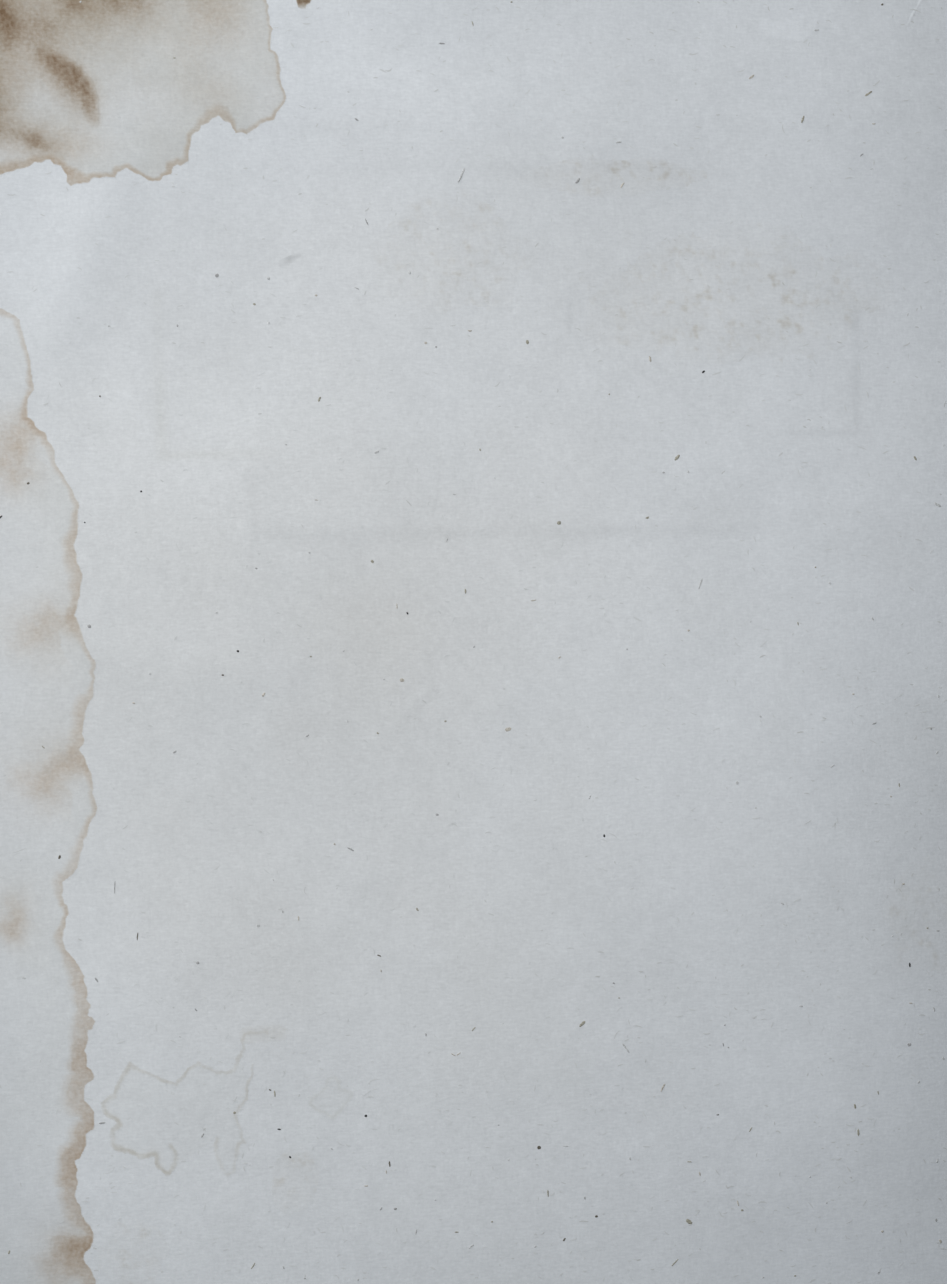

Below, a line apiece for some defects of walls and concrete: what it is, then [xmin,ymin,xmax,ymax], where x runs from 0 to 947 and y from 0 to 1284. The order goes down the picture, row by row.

damp [0,0,287,186]
damp [296,0,311,9]
damp [0,308,289,1284]